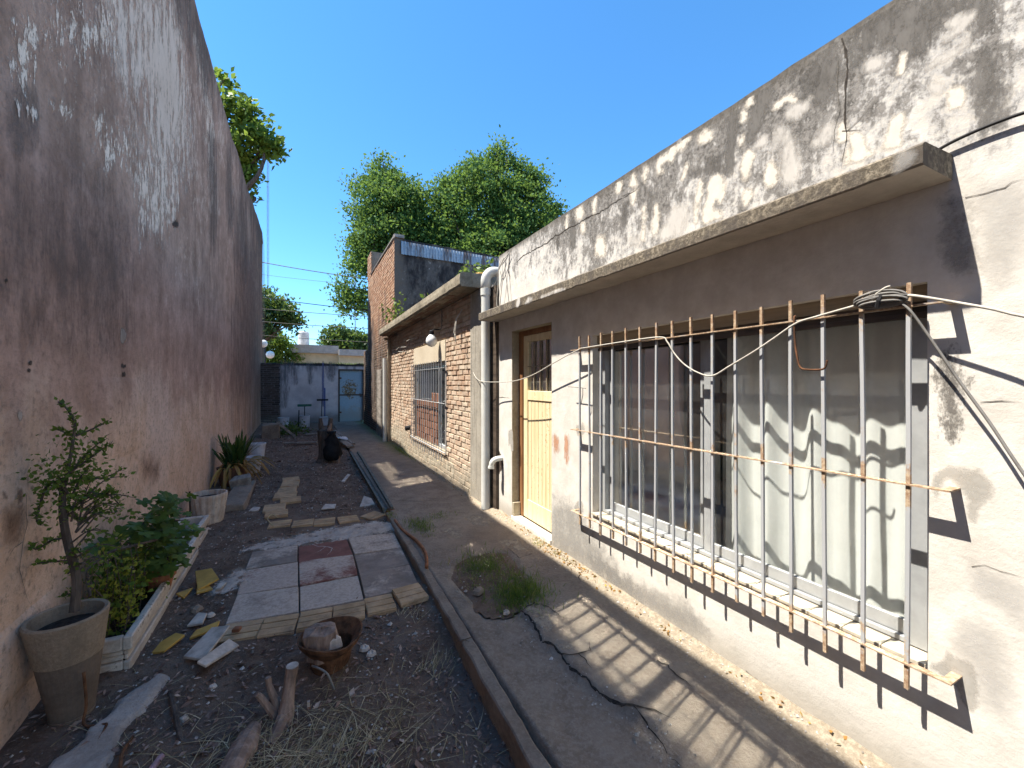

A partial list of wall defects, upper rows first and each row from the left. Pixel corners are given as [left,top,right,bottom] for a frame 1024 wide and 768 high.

peeling [8,0,218,255]
damp [691,86,774,177]
crack [833,38,874,168]
damp [791,0,995,109]
damp [971,51,1011,125]
damp [556,218,576,253]
crack [502,168,668,276]
damp [933,352,971,443]
crack [520,571,680,765]